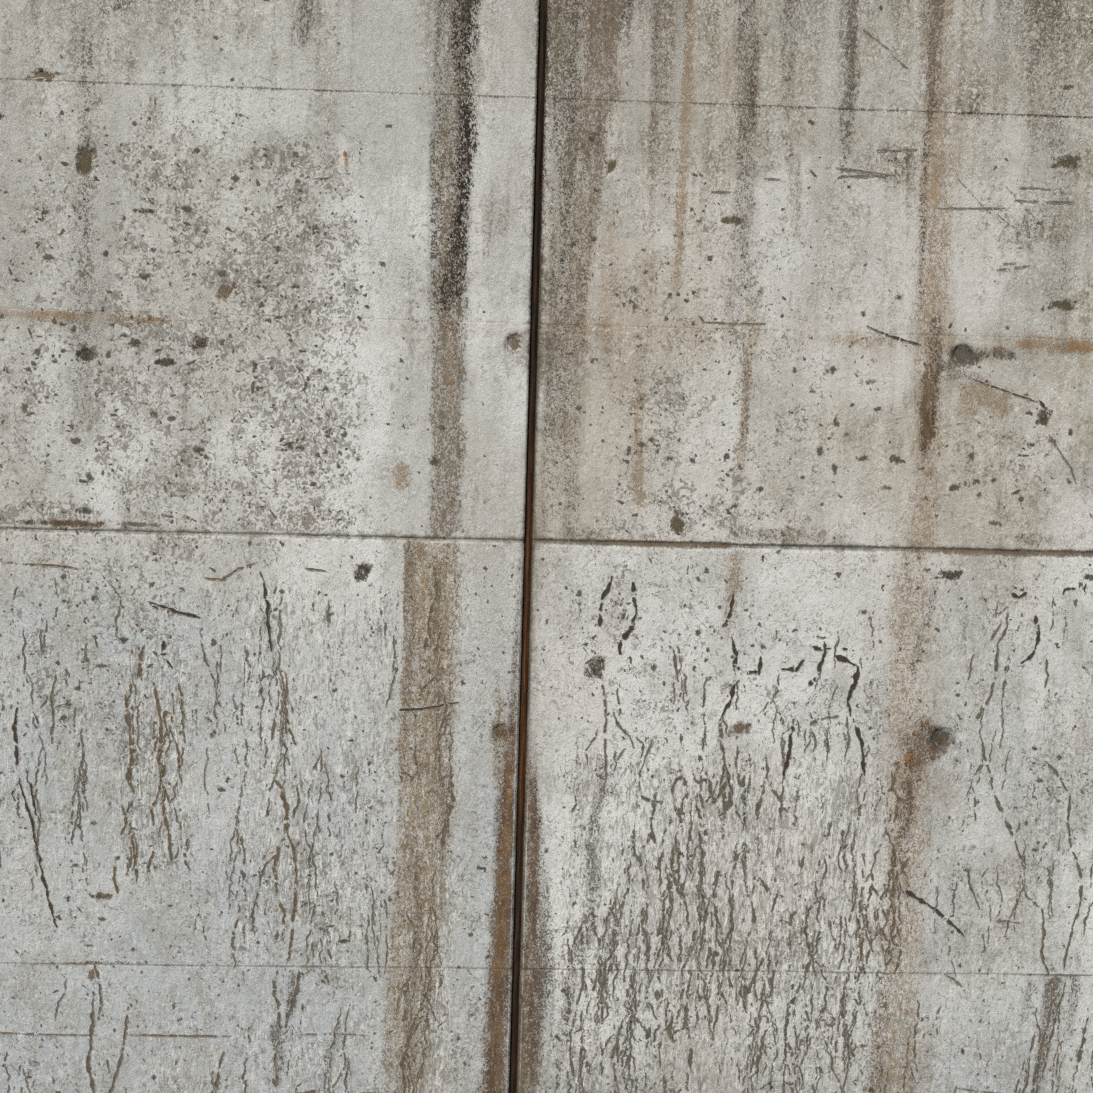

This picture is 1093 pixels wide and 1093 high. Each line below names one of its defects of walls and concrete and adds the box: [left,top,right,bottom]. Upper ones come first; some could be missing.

water stain [429,0,481,326]
water stain [543,0,825,549]
water stain [810,0,860,258]
water stain [983,0,1071,272]
water stain [933,534,1093,558]
corrosion [478,579,555,1093]
crack [550,573,1093,1093]